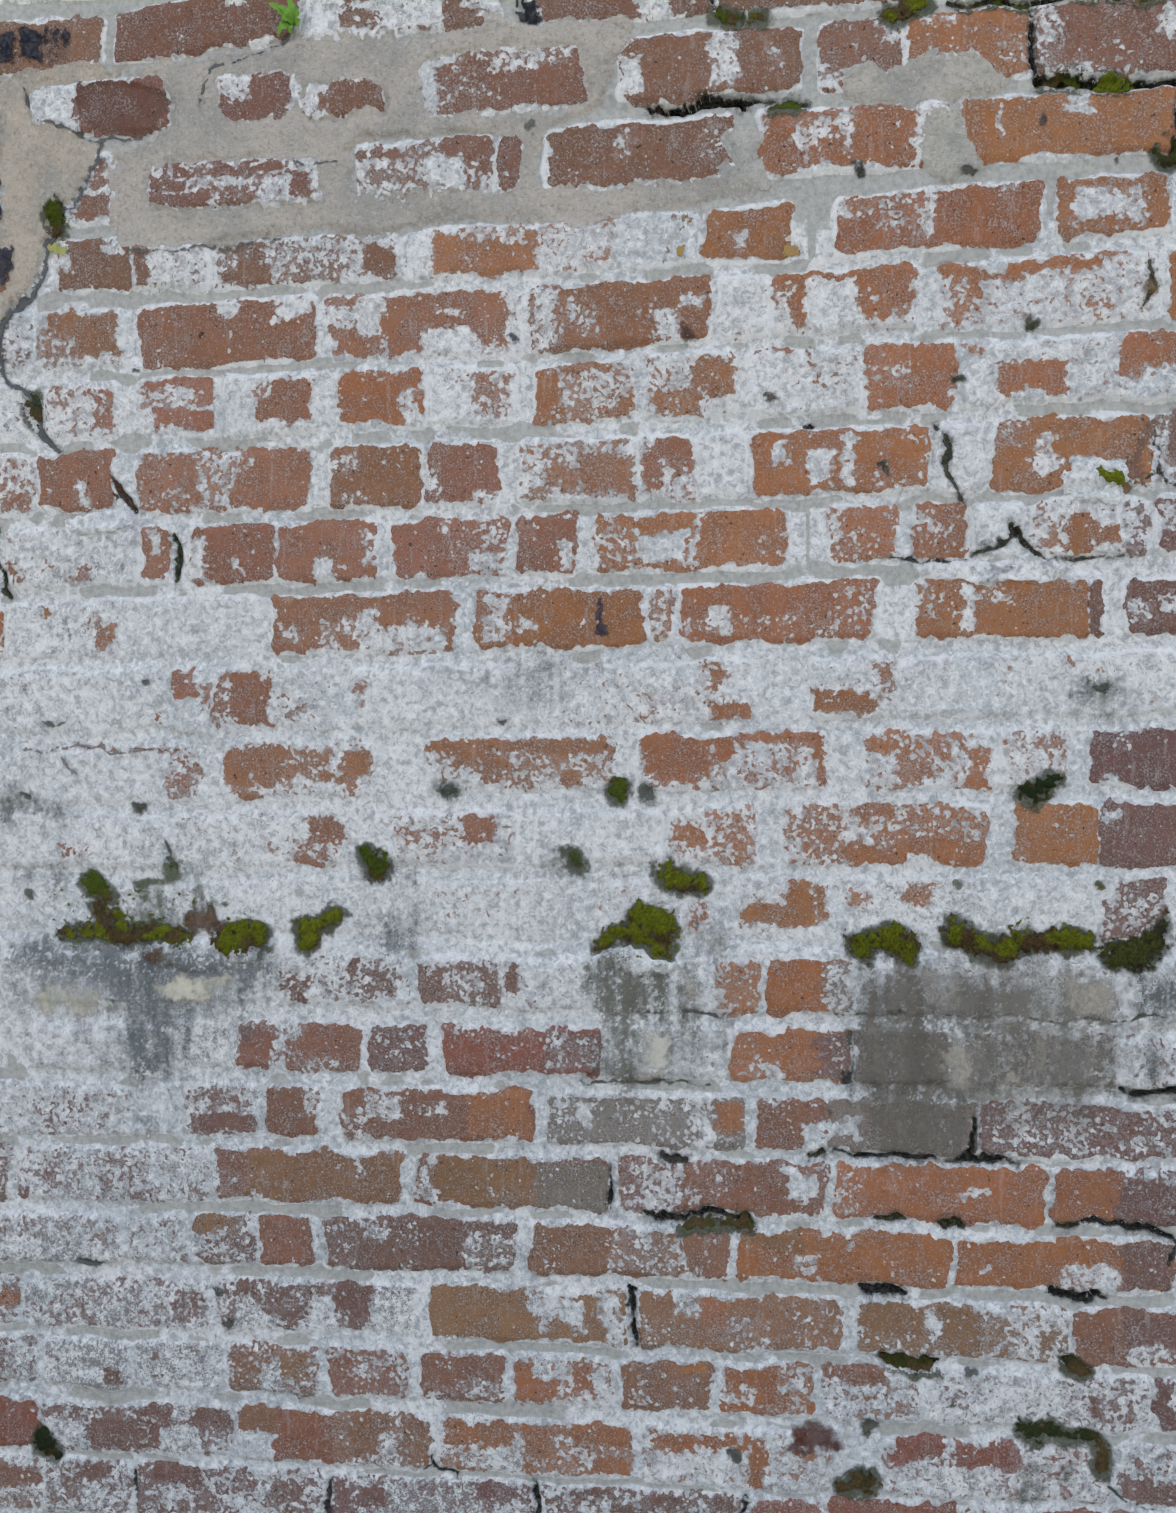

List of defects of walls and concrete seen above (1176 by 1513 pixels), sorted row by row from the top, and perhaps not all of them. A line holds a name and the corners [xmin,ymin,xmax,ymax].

crack [1026,11,1039,77]
crack [0,88,142,454]
crack [111,476,138,514]
crack [934,424,963,502]
crack [889,522,1124,563]
water stain [132,802,147,813]
water stain [437,780,459,800]
water stain [8,935,277,1081]
water stain [586,956,700,1083]
water stain [843,957,1176,1161]
crack [626,1284,640,1347]
water stain [726,1448,742,1464]